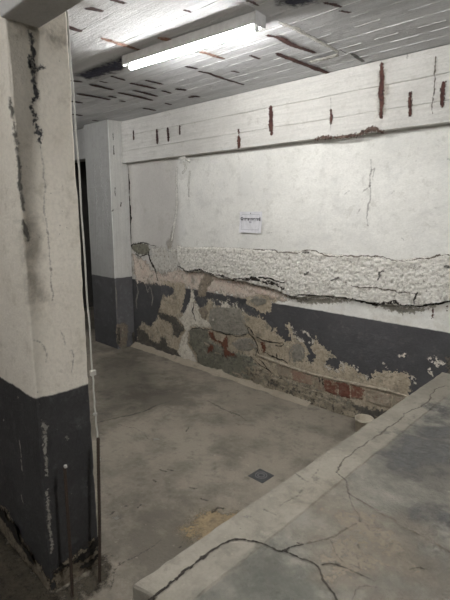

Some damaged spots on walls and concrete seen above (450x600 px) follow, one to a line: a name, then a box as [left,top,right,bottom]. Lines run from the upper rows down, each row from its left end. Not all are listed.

corrosion [265,34,317,54]
corrosion [276,53,330,74]
corrosion [72,76,200,111]
crack [429,57,437,114]
corrosion [439,81,447,108]
spalling [375,305,436,316]
peeling [115,242,416,419]
crack [148,386,450,600]
spalling [0,437,101,598]